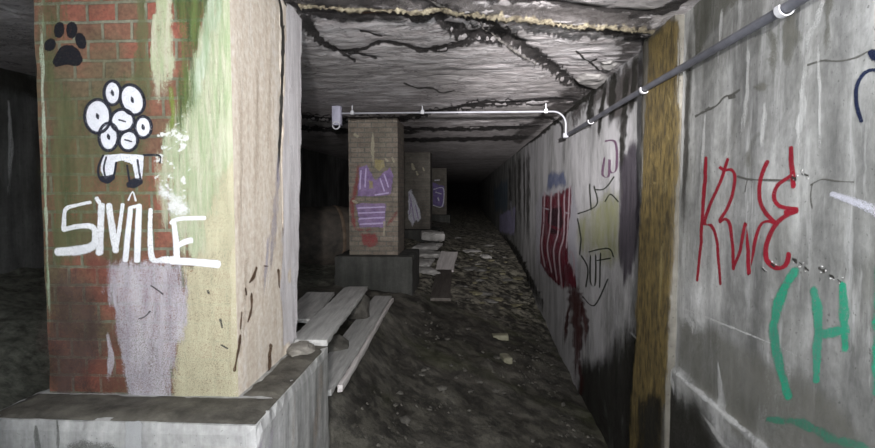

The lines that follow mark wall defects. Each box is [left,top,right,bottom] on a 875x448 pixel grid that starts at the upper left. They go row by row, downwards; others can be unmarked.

peeling [149,0,302,397]
crack [277,0,688,178]
leakage [676,0,753,225]
crack [695,89,740,118]
leakage [740,0,834,175]
leakage [575,307,875,448]